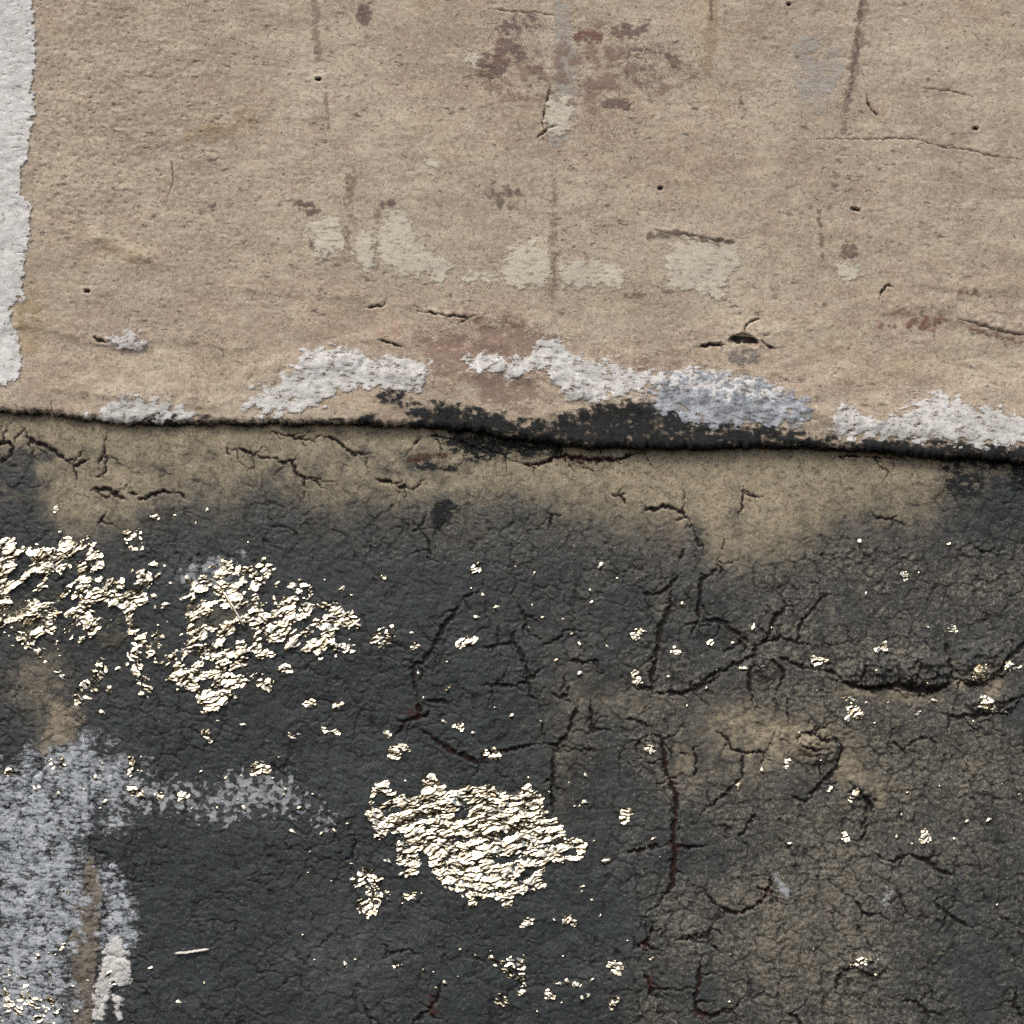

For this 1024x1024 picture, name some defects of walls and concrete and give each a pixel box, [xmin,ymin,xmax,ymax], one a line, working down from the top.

corrosion [572,28,602,58]
water stain [415,302,558,414]
crack [698,318,781,349]
crack [0,421,186,529]
crack [227,430,1024,1024]
crack [81,768,111,861]